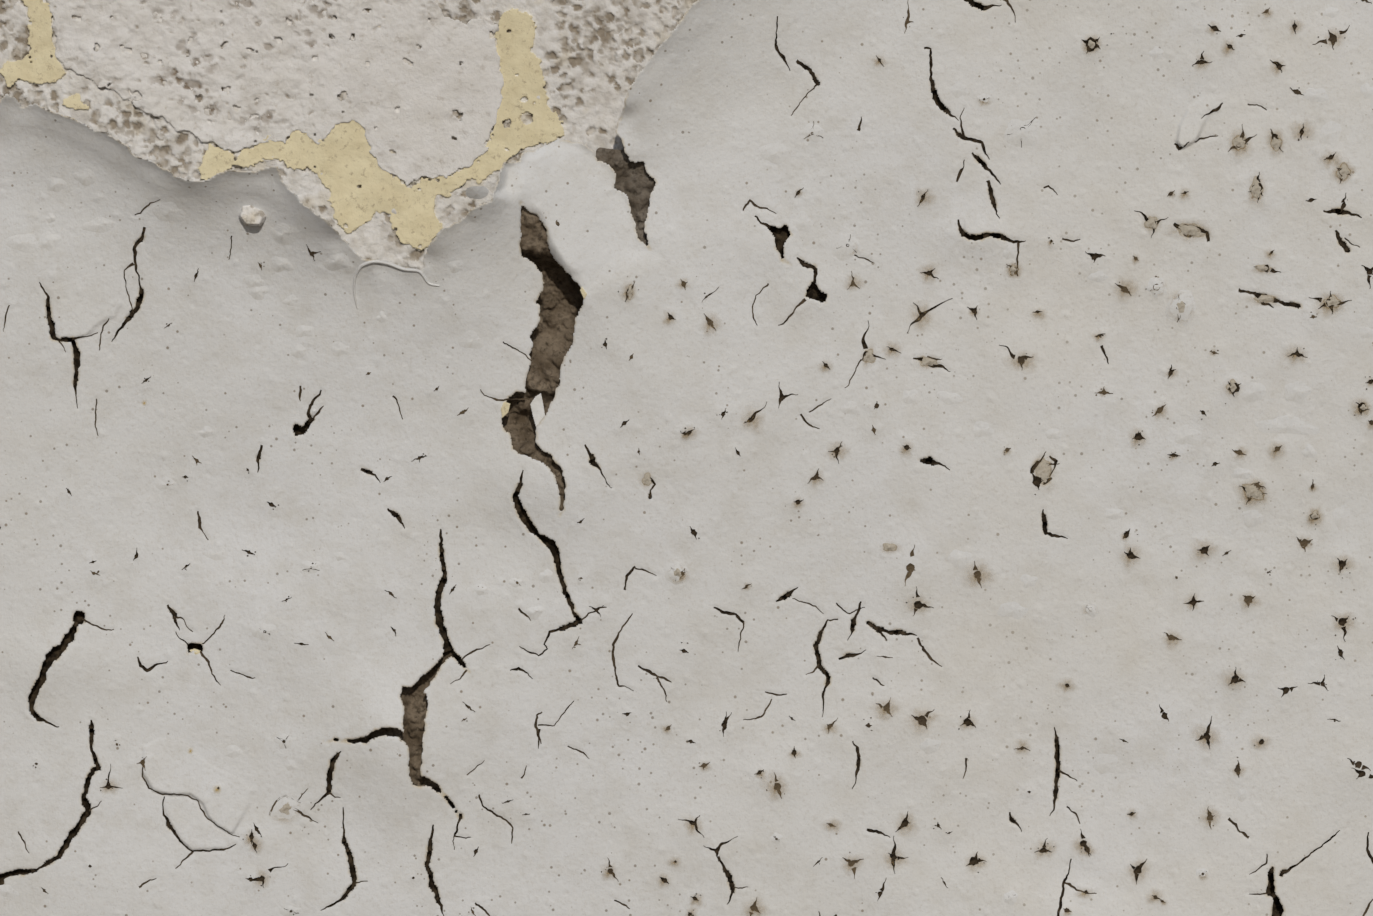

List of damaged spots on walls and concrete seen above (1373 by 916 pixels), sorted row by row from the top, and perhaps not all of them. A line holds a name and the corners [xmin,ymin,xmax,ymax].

crack [1081,33,1112,54]
peeling [0,0,697,270]
crack [596,147,656,246]
crack [1062,190,1210,322]
crack [1000,345,1034,369]
crack [0,187,985,916]
crack [1297,482,1350,573]
crack [1279,615,1356,722]
crack [1198,716,1265,777]
crack [1348,758,1373,779]
spalling [1057,859,1097,916]
crack [1207,806,1373,916]